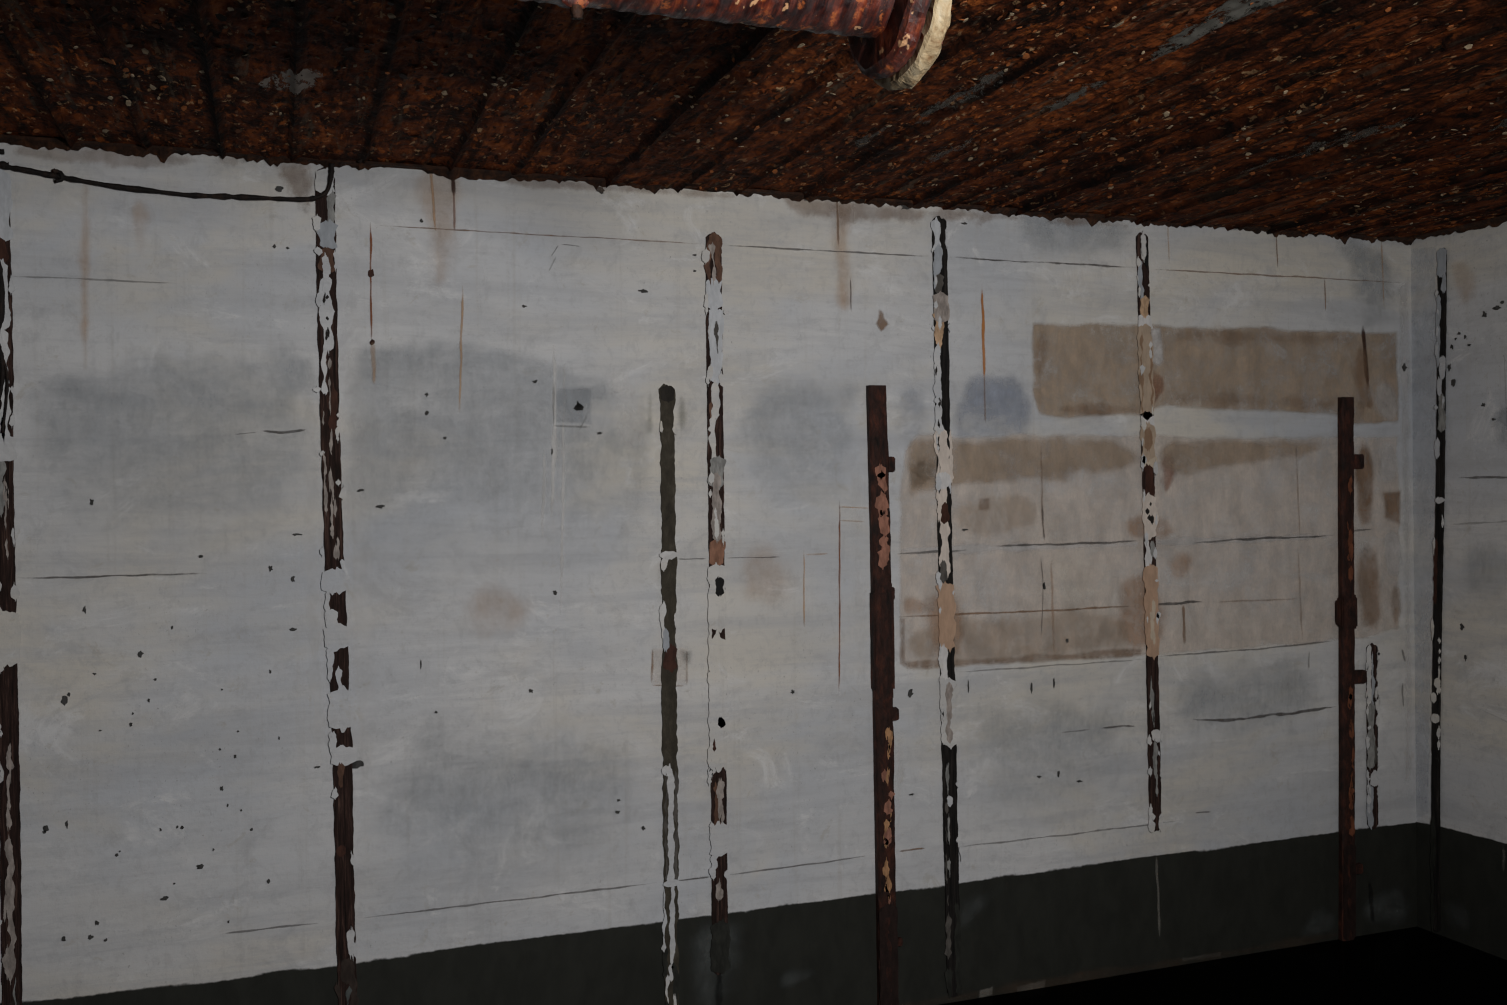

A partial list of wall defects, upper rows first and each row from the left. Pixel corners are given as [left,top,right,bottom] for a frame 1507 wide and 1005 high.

corrosion [561,0,589,20]
corrosion [318,247,335,272]
corrosion [0,134,665,224]
corrosion [684,186,1507,269]
corrosion [327,387,338,437]
peeling [931,217,969,878]
peeling [1136,230,1161,660]
water stain [901,324,1400,667]
peeling [659,600,678,652]
peeling [1147,678,1163,833]
peeling [1366,643,1380,830]
peeling [661,763,680,1005]